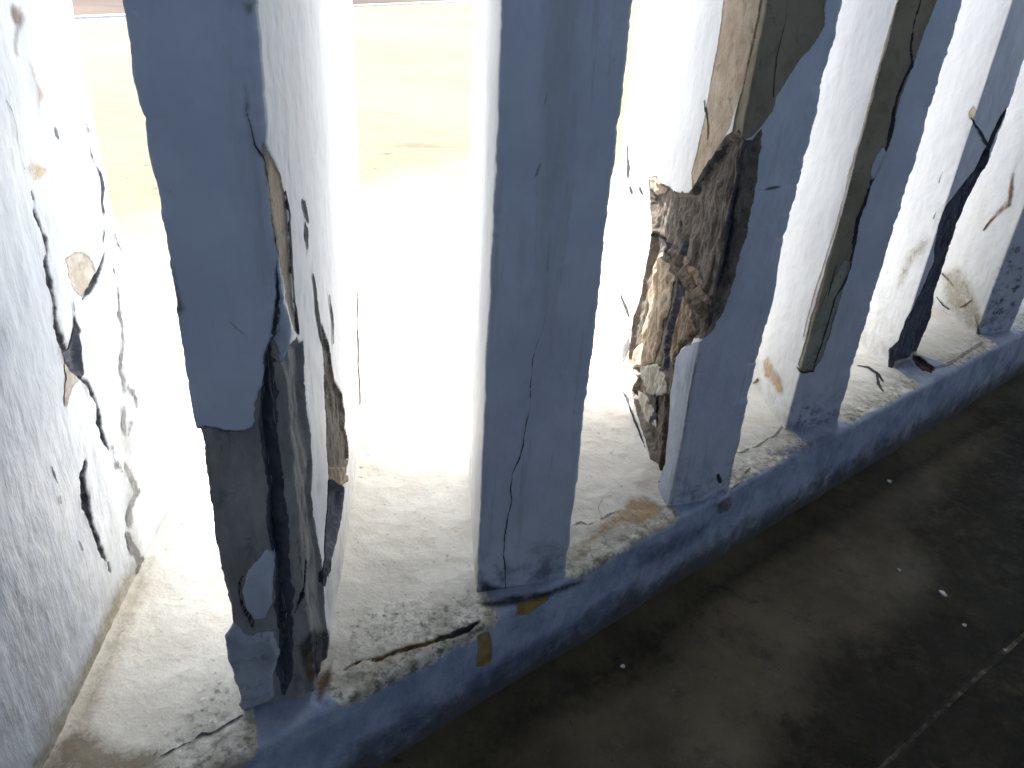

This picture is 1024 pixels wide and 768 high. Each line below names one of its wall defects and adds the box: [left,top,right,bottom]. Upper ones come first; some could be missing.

spalling [65,253,104,299]
crack [31,124,144,573]
spalling [196,114,349,711]
crack [503,342,538,588]
spalling [621,0,826,512]
spalling [798,0,937,371]
crack [858,365,884,392]
spalling [888,149,990,368]
crack [346,622,478,670]